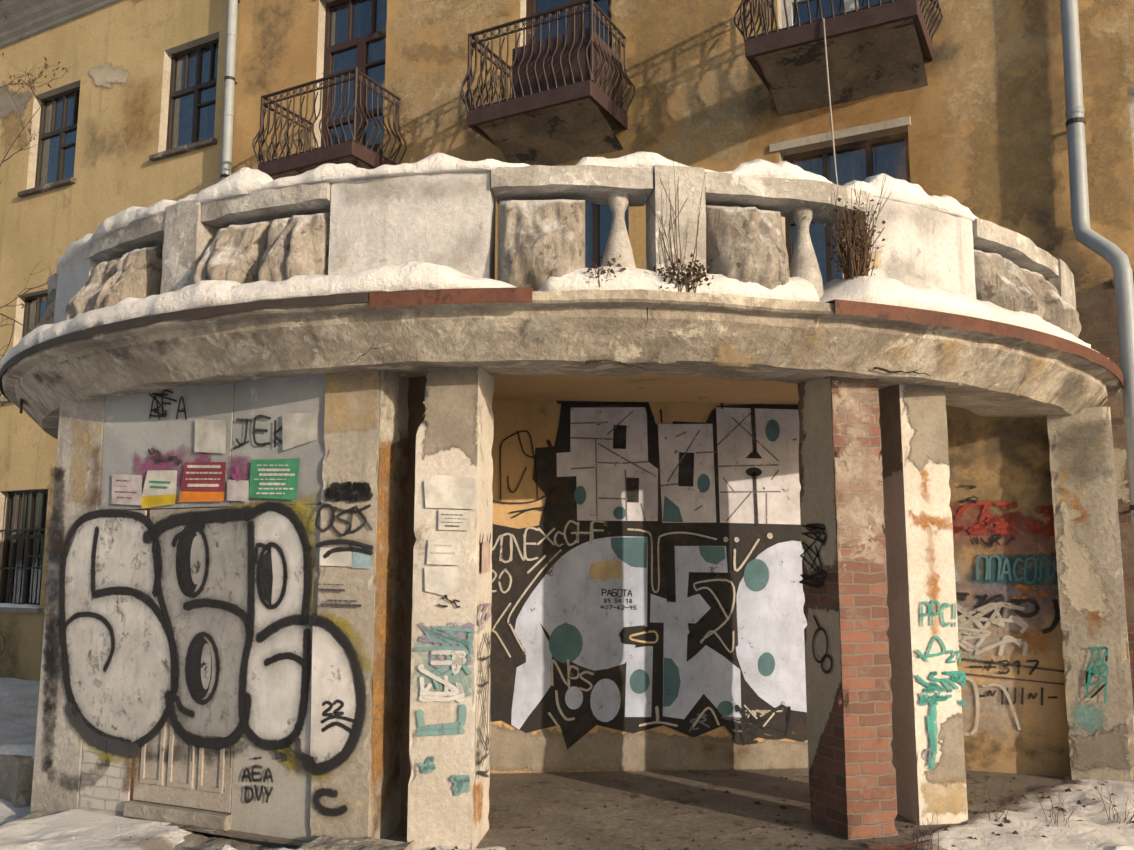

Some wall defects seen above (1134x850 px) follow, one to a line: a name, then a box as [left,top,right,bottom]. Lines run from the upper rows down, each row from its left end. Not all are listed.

peeling [0,81,32,149]
peeling [88,62,129,88]
flaking render [1074,270,1121,370]
spalling [421,367,478,466]
peeling [800,377,949,584]
rust [909,511,952,529]
peeling [1057,387,1134,708]
rust [372,437,410,831]
rust [928,575,940,634]
spalling [922,713,967,816]
spalling [1070,723,1134,772]